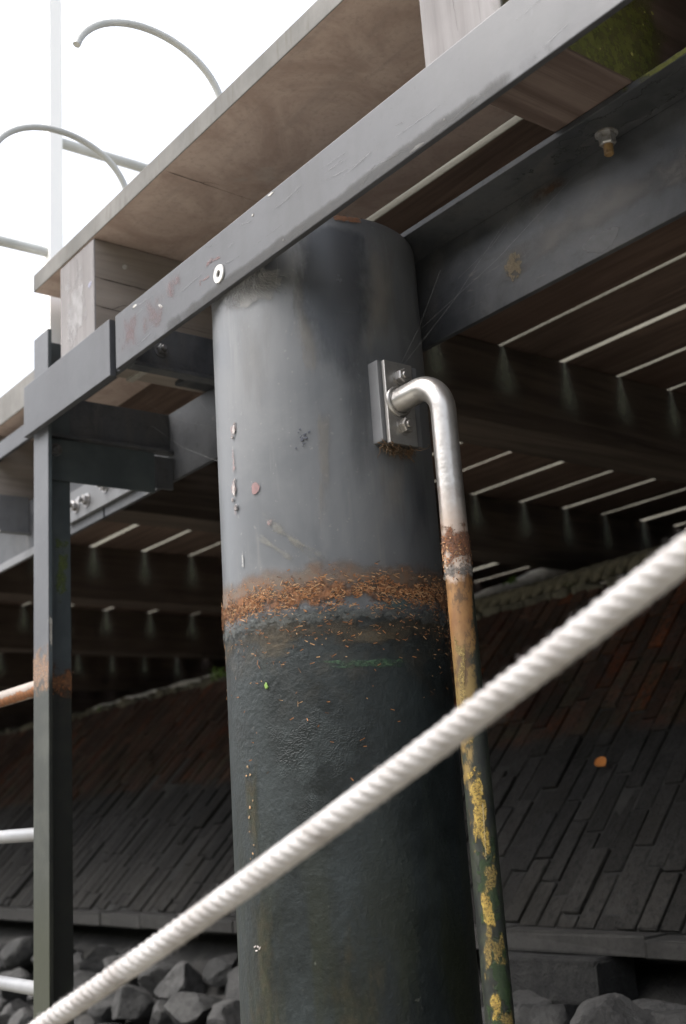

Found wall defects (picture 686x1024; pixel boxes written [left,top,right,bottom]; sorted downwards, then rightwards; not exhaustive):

corrosion [221,523,473,676]
corrosion [0,654,74,707]
peeling [465,736,513,1024]